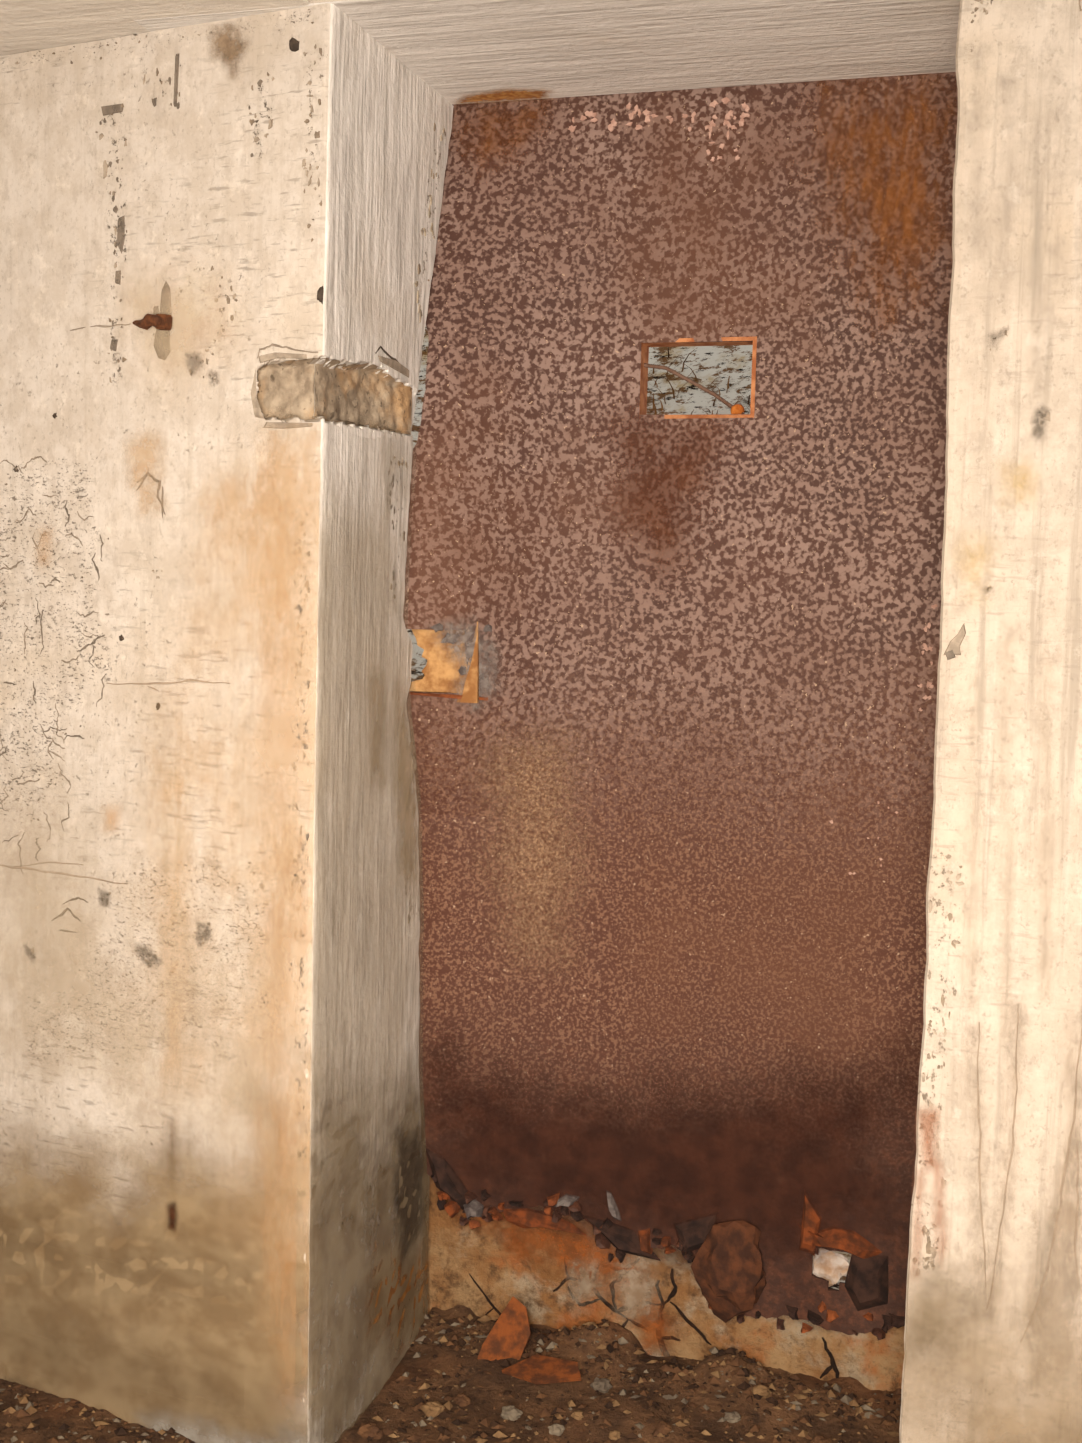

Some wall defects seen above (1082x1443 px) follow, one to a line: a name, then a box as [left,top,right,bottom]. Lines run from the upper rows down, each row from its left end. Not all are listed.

rust [460,90,547,103]
crack [0,456,230,933]
water stain [0,1089,430,1443]
rust [426,1148,839,1333]
rust [799,1196,905,1340]
water stain [962,1349,1082,1443]